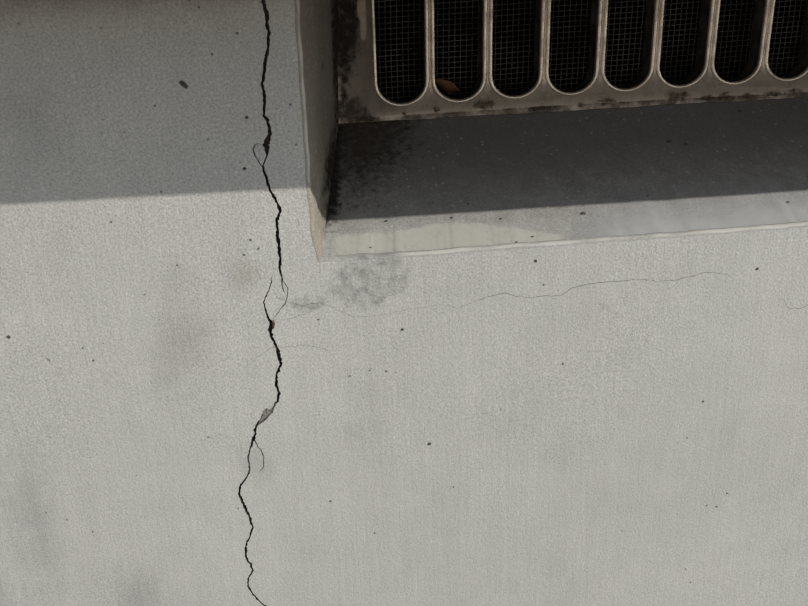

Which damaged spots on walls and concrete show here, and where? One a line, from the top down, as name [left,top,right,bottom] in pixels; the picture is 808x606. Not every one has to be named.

damp [323,0,410,223]
crack [238,0,434,606]
damp [335,223,561,255]